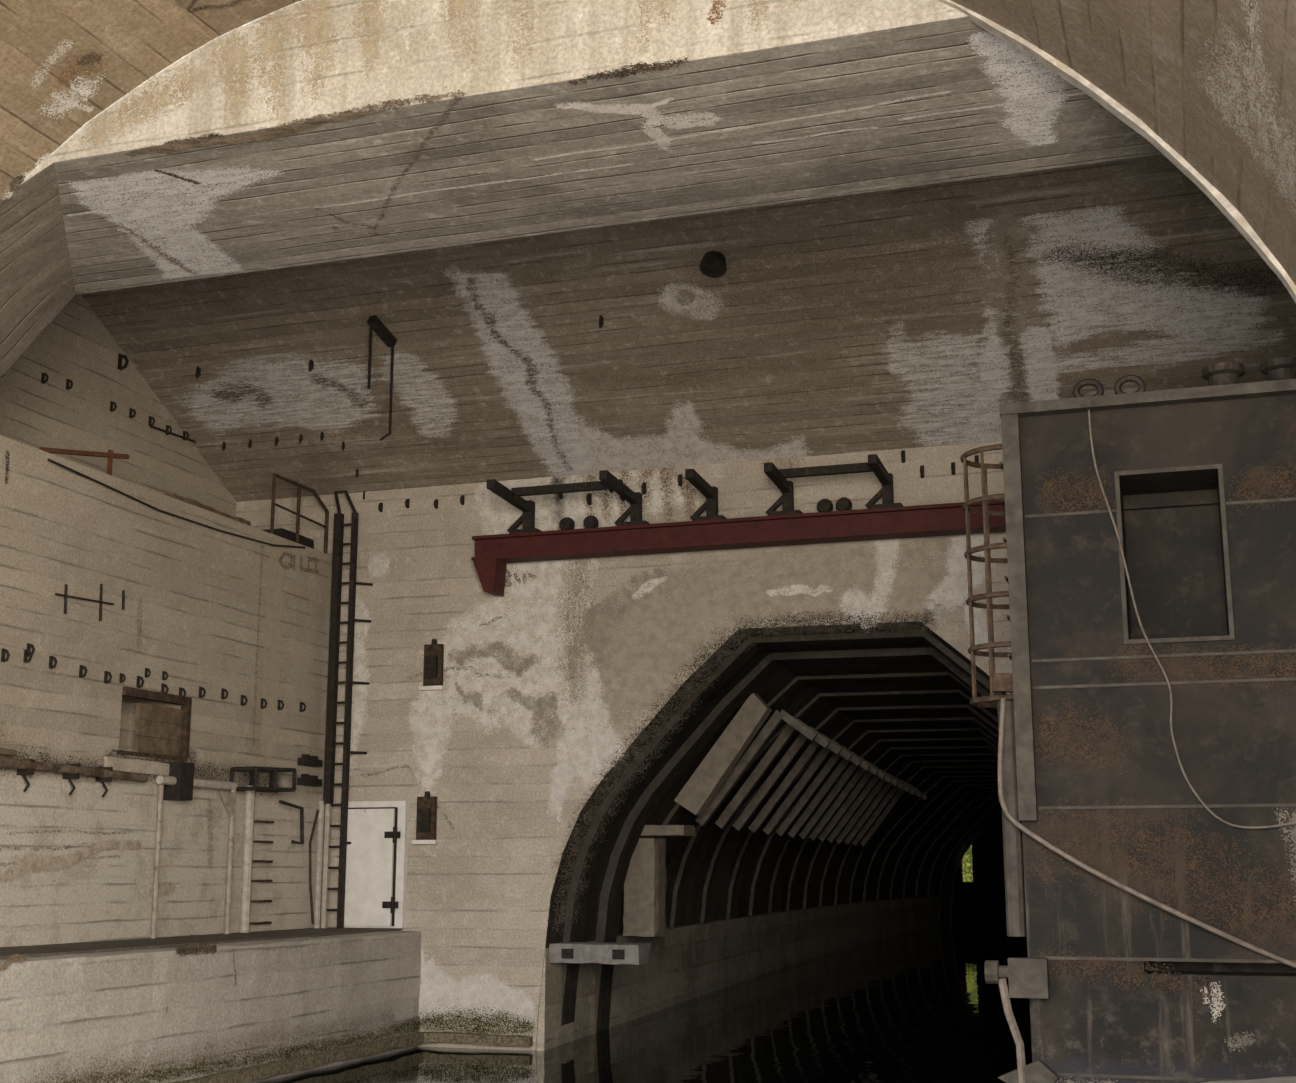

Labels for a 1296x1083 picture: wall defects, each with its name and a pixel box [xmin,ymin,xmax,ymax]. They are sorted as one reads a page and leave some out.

damp [438,0,539,73]
damp [632,0,681,57]
damp [707,0,726,24]
damp [744,0,811,35]
damp [36,0,388,150]
damp [441,198,1287,477]
corrosion [1106,635,1296,694]
corrosion [1034,697,1136,777]
corrosion [1025,794,1296,959]
corrosion [1033,946,1220,1002]